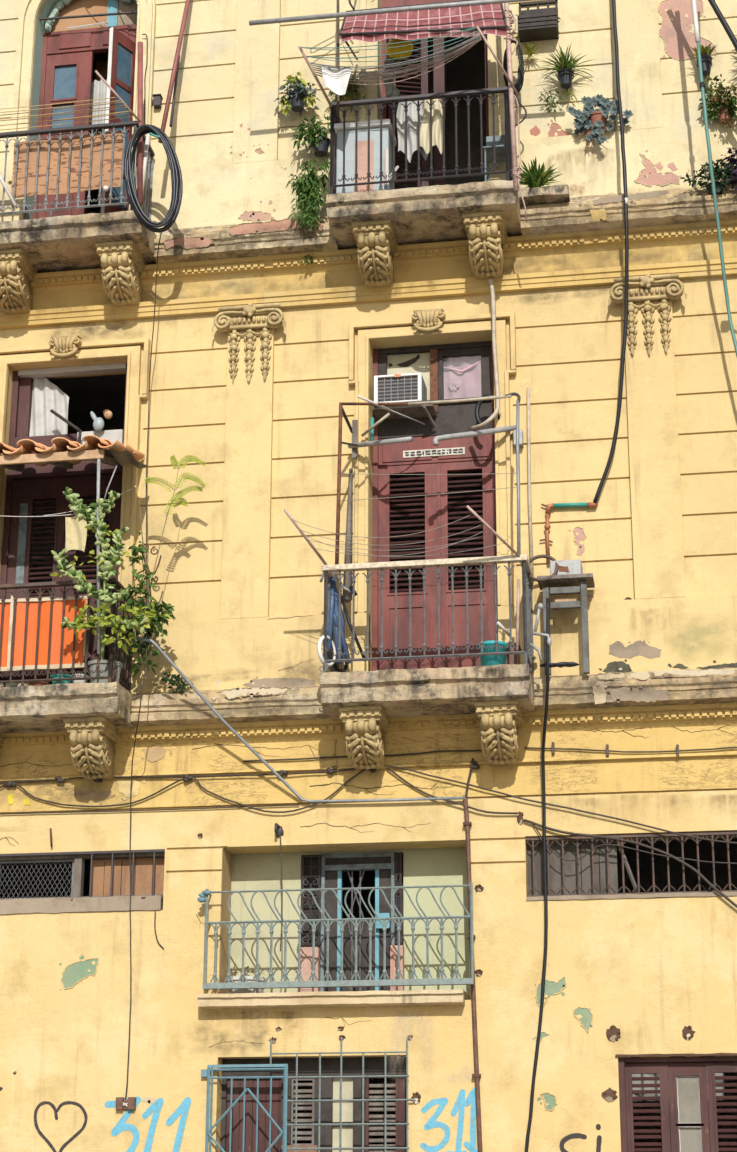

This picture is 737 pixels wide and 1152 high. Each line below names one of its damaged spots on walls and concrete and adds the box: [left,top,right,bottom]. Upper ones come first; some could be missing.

peeling [658,0,717,62]
peeling [530,119,572,137]
peeling [579,150,681,222]
peeling [229,200,323,236]
peeling [569,526,587,556]
peeling [592,640,734,704]
crack [192,744,457,795]
crack [302,823,429,833]
peeling [59,955,99,990]
peeling [535,976,567,1009]
peeling [573,1006,593,1033]
spalling [606,1025,621,1042]